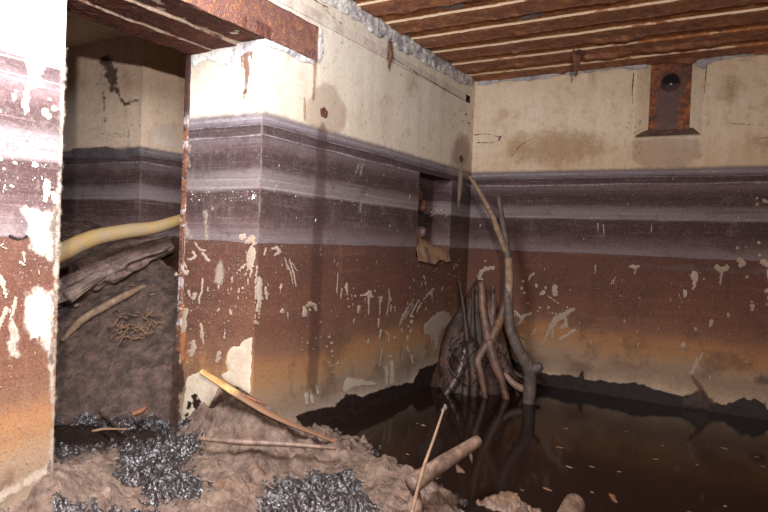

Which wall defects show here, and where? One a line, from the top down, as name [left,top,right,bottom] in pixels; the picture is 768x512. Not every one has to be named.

peeling [11,55,46,115]
peeling [41,53,65,126]
rust [240,52,253,96]
peeling [191,25,324,67]
peeling [322,0,648,103]
peeling [21,173,61,302]
peeling [48,329,56,418]
water stain [170,349,250,427]
peeling [183,337,252,418]
water stain [296,361,438,428]
water stain [510,358,524,382]
water stain [537,371,768,420]